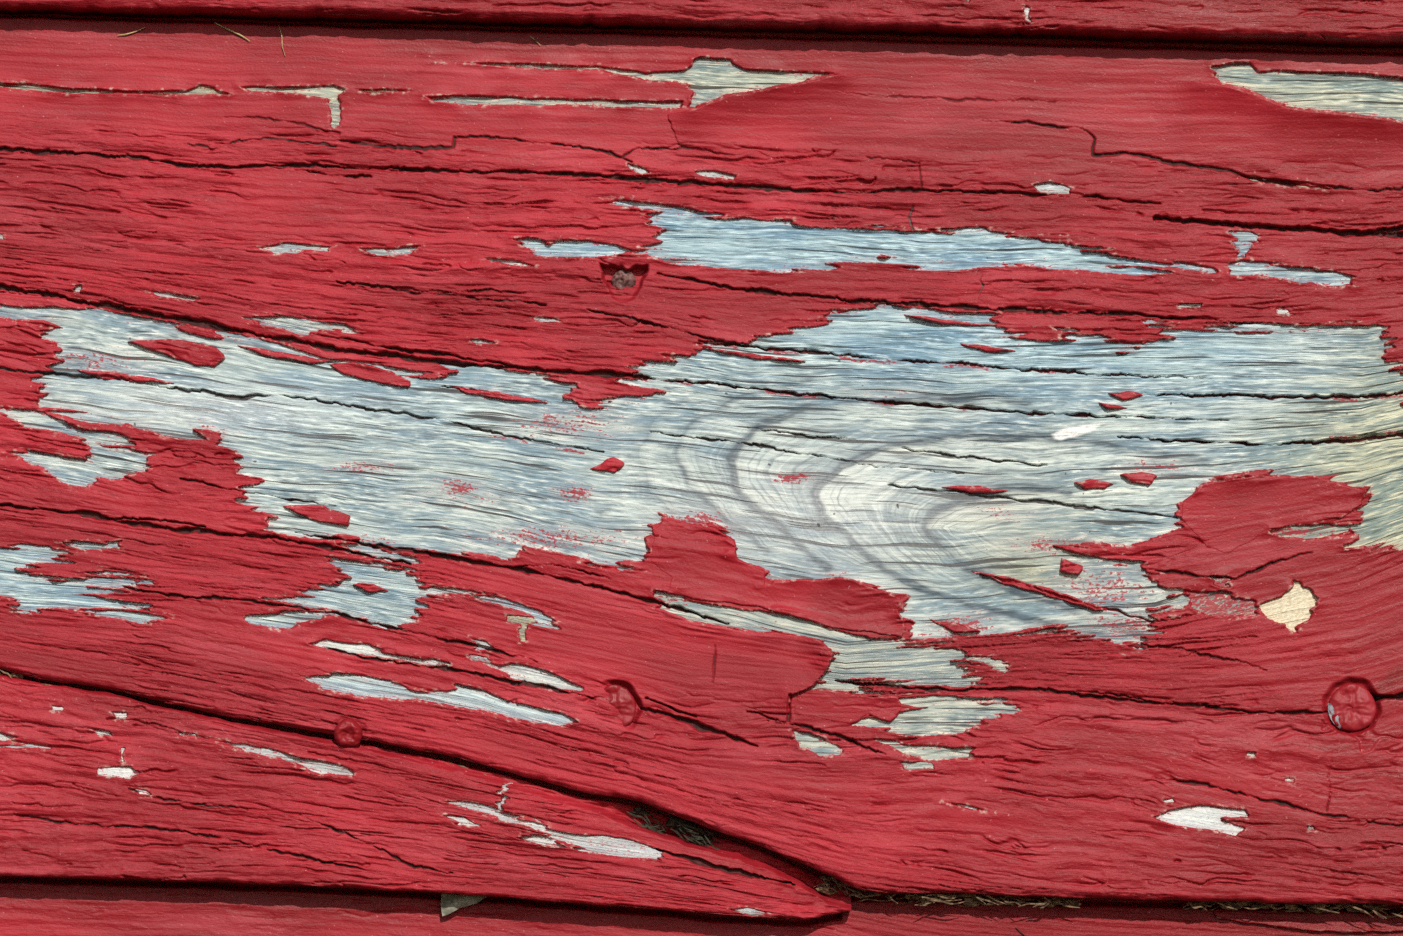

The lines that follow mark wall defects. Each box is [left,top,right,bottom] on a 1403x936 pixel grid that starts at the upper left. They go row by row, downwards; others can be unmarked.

crack [0,117,1051,230]
crack [887,95,1298,187]
peeling [1144,64,1403,189]
peeling [488,201,1351,286]
crack [1084,195,1403,238]
crack [656,273,1263,325]
peeling [0,304,1403,770]
peeling [227,742,353,775]
crack [640,696,882,753]
crack [17,788,453,874]
peeling [446,783,663,860]
peeling [1155,799,1248,836]